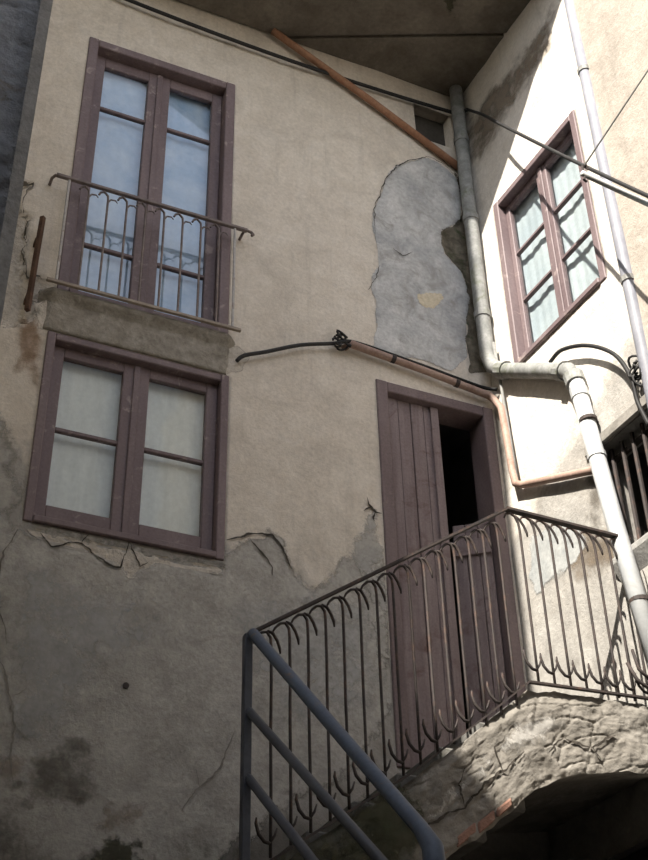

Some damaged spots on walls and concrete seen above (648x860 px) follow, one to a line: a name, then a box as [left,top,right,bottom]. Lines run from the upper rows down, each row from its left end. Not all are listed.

spalling [1,181,50,329]
rust [21,322,40,369]
spalling [226,346,249,374]
crack [41,534,148,568]
crack [0,614,31,785]
flaking render [0,420,392,860]